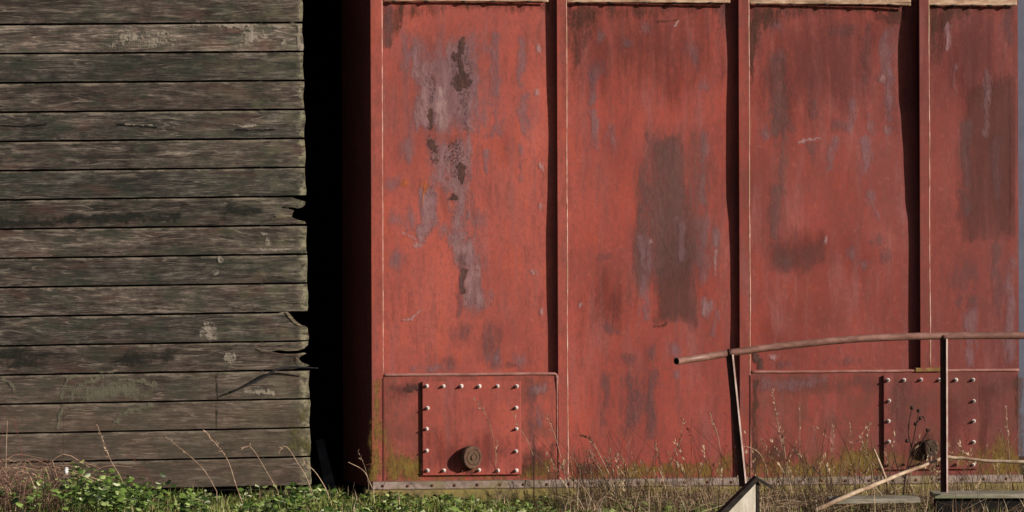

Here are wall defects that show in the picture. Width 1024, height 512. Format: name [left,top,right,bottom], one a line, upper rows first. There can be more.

peeling [402,42,492,310]